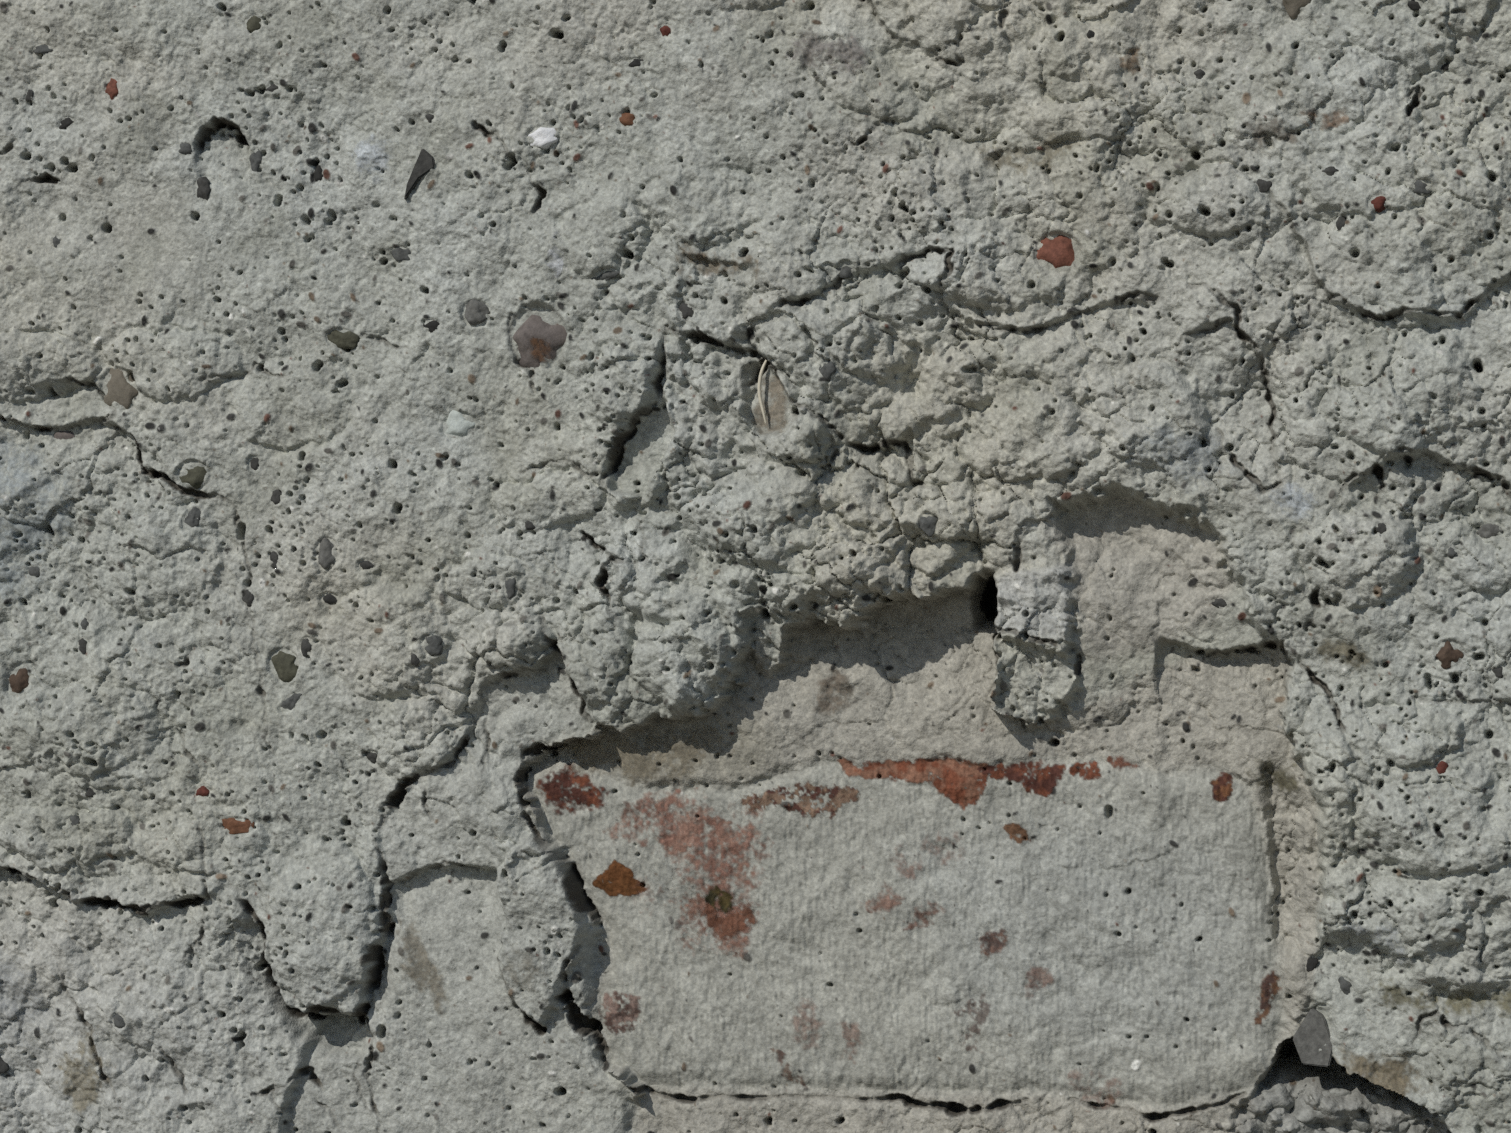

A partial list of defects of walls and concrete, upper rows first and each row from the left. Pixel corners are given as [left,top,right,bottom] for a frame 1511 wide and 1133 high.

crack [779,247,954,307]
crack [523,324,933,490]
crack [976,283,1282,493]
crack [0,378,273,752]
crack [584,519,648,621]
crack [1014,515,1052,572]
crack [0,824,272,974]
crack [255,614,1028,1133]
spalling [274,499,1451,1133]
crack [58,965,117,1102]
crack [160,1047,188,1092]
crack [1070,1092,1246,1122]